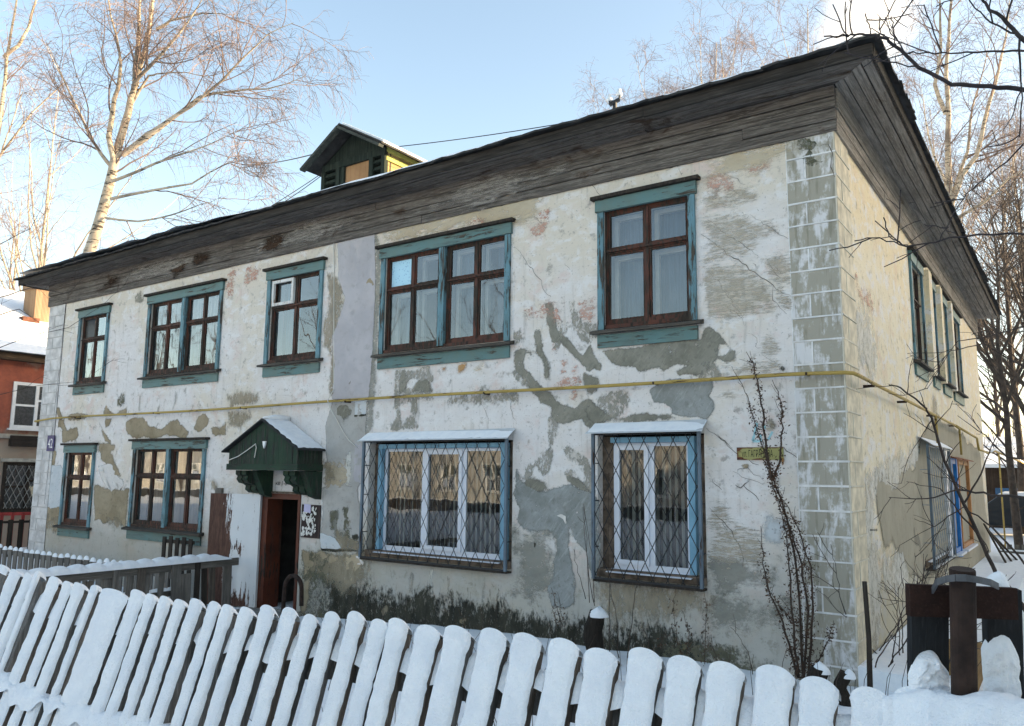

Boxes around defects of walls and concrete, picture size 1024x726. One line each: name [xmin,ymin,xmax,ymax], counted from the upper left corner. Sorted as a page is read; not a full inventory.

peeling [703,173,791,318]
peeling [46,408,86,532]
spalling [94,392,257,527]
leakage [299,507,586,646]
leakage [595,506,787,671]